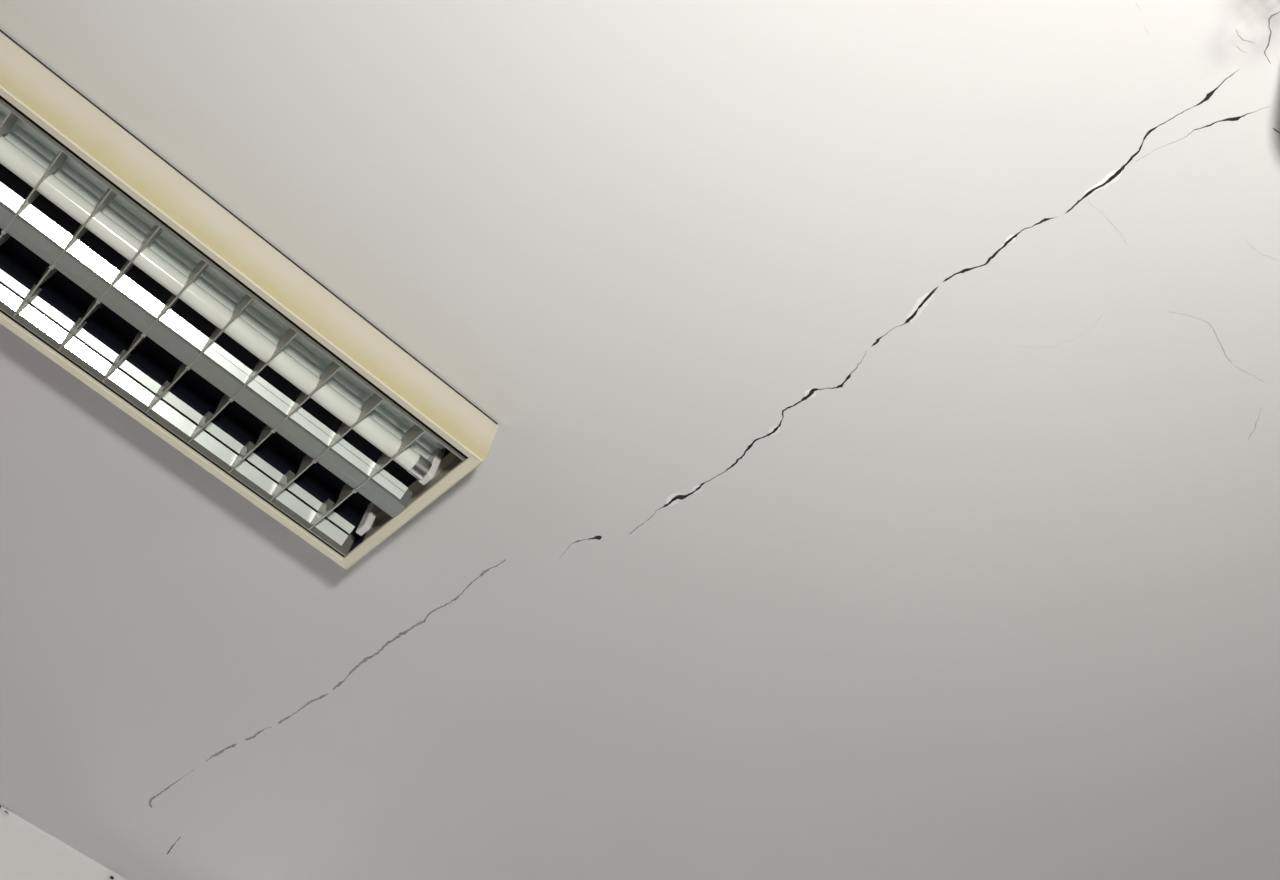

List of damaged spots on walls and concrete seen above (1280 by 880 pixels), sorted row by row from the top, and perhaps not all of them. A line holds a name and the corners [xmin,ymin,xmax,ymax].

crack [560,11,1280,558]
crack [149,559,506,807]